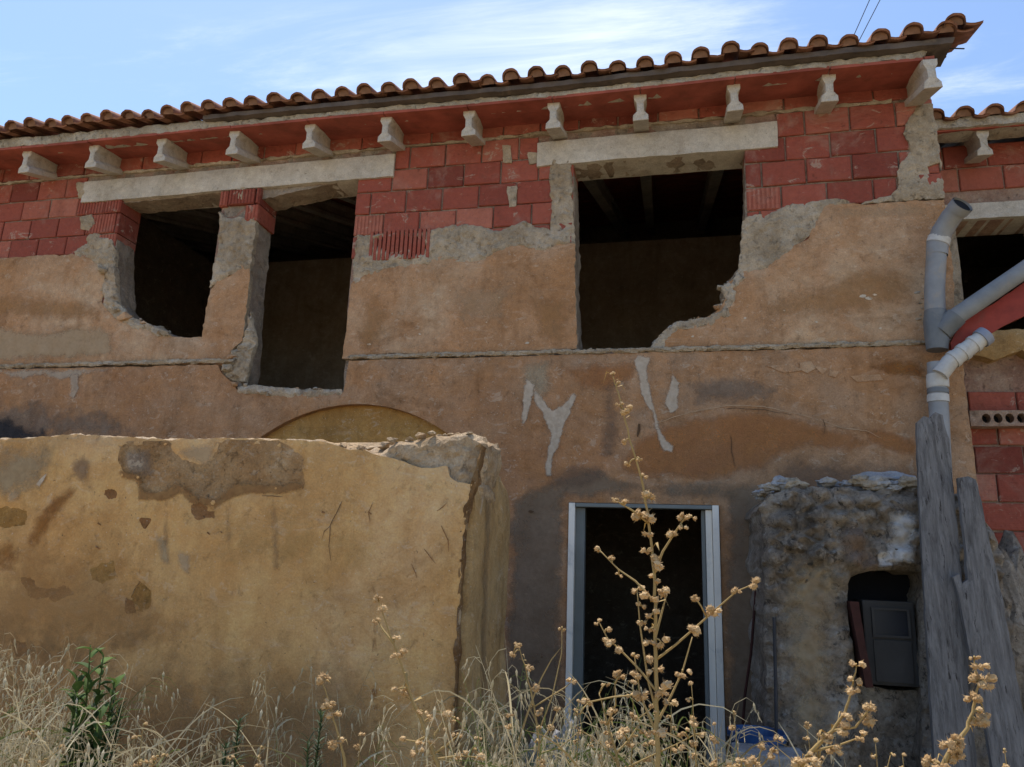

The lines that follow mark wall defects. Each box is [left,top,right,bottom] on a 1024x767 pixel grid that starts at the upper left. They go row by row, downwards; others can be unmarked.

spalling [650,270,746,348]